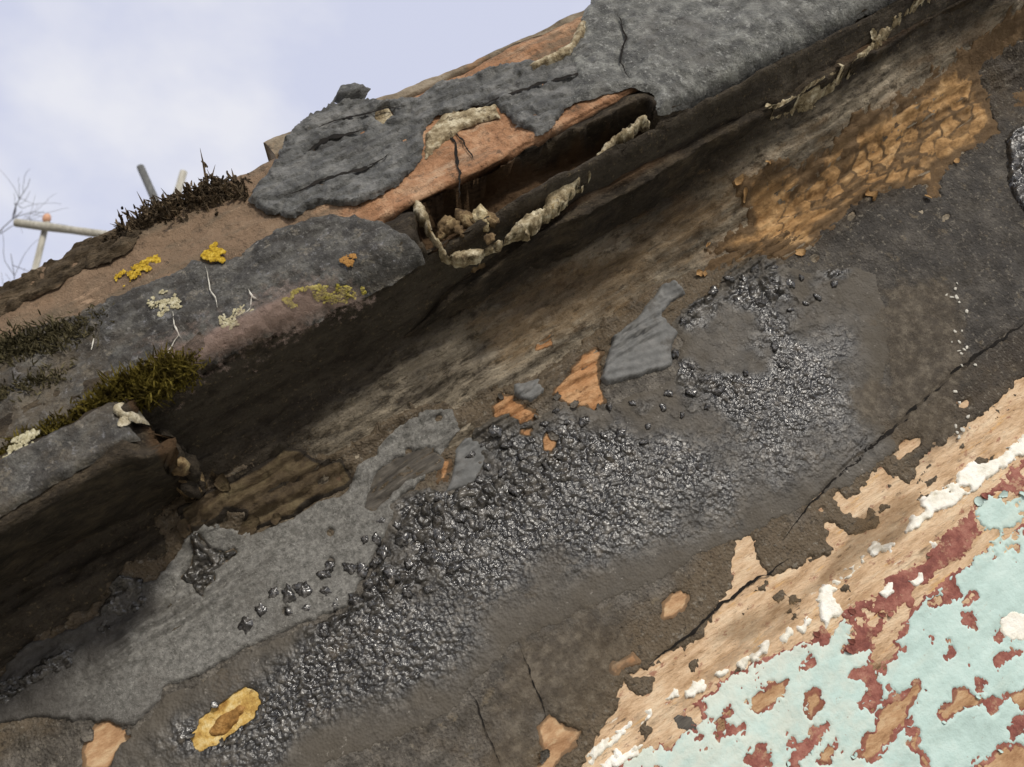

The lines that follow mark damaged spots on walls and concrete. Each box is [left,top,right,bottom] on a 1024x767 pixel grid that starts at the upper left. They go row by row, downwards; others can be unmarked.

peeling [332,83,371,103]
crack [478,72,579,108]
crack [616,16,629,77]
spalling [596,115,650,156]
spalling [413,170,591,273]
peeling [491,280,685,452]
crack [649,323,1024,665]
peeling [665,434,1024,705]
peeling [536,709,652,767]
peeling [786,688,834,767]
peeling [847,665,921,763]
peeling [938,678,1024,767]